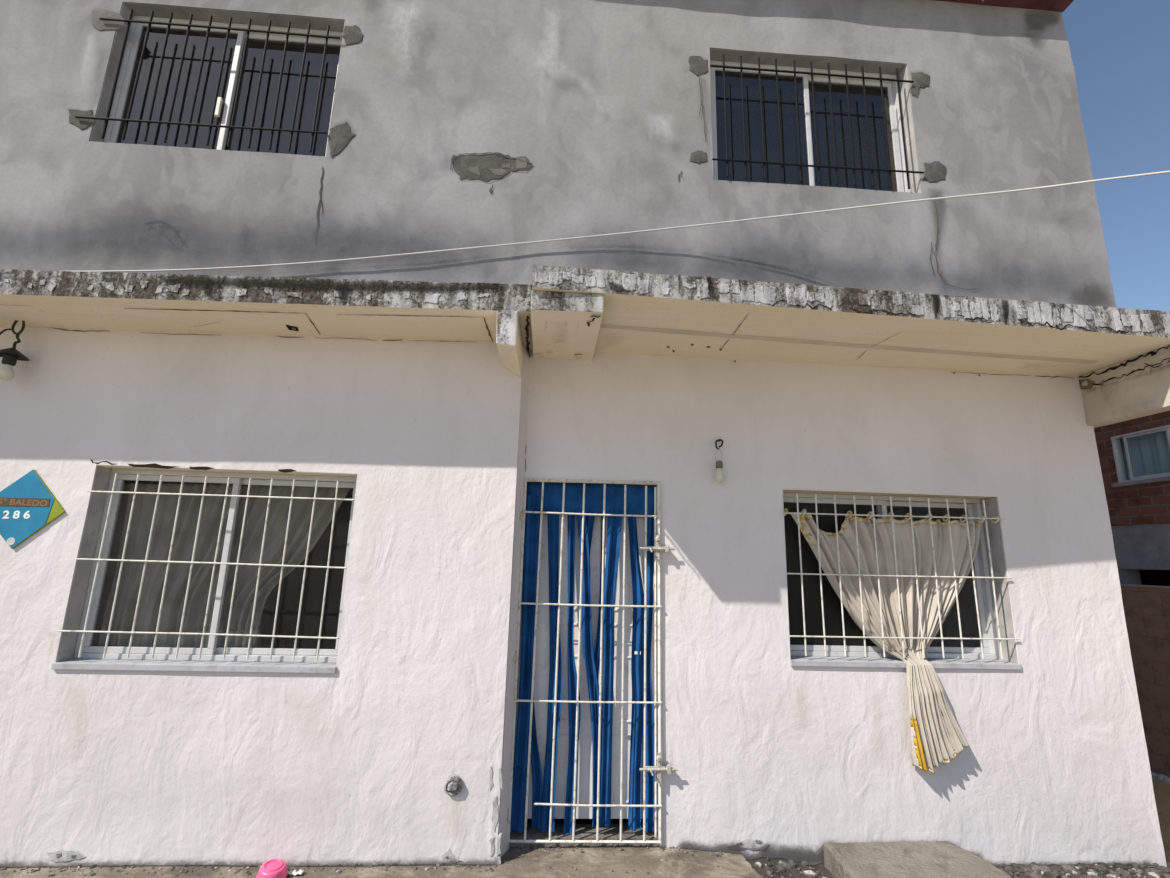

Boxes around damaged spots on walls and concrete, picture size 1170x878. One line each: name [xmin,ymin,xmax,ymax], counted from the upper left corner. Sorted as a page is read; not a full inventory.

spalling [450,152,533,182]
crack [316,167,324,229]
damp [932,191,941,233]
damp [66,218,455,265]
damp [162,276,500,300]
damp [703,246,860,296]
damp [933,276,976,317]
crack [930,224,992,323]
crack [960,320,1170,389]